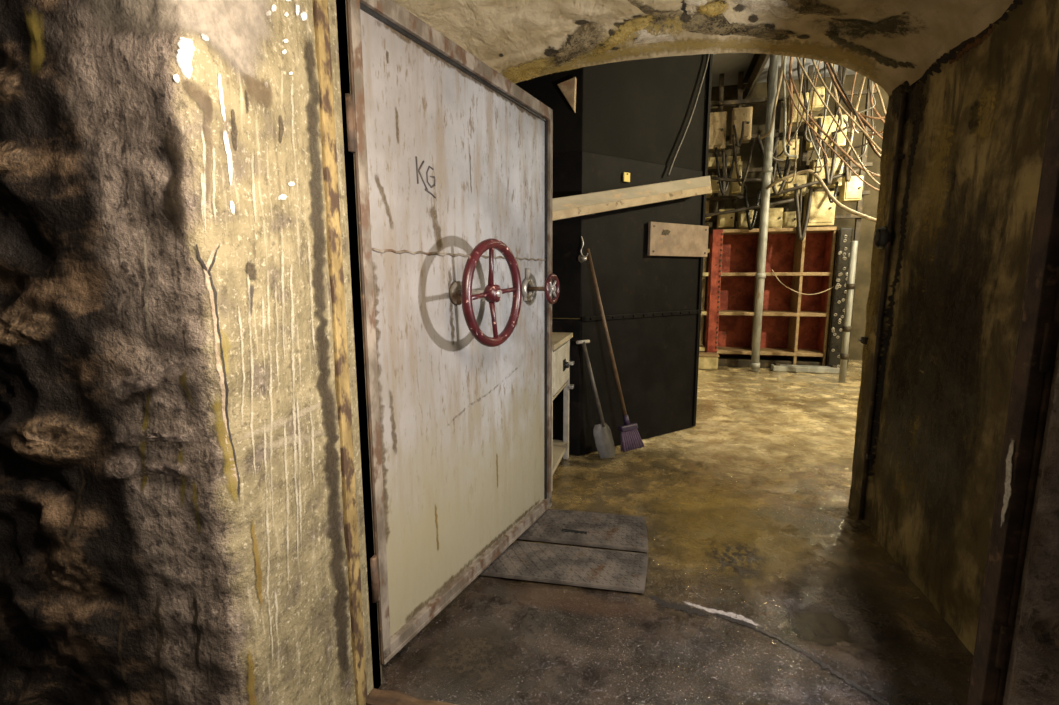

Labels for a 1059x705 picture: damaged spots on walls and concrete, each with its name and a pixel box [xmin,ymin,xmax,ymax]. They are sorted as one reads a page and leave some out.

spalling [499,0,845,84]
water stain [201,74,232,229]
crack [196,244,240,499]
water stain [239,313,278,468]
water stain [262,254,293,339]
water stain [266,515,278,656]